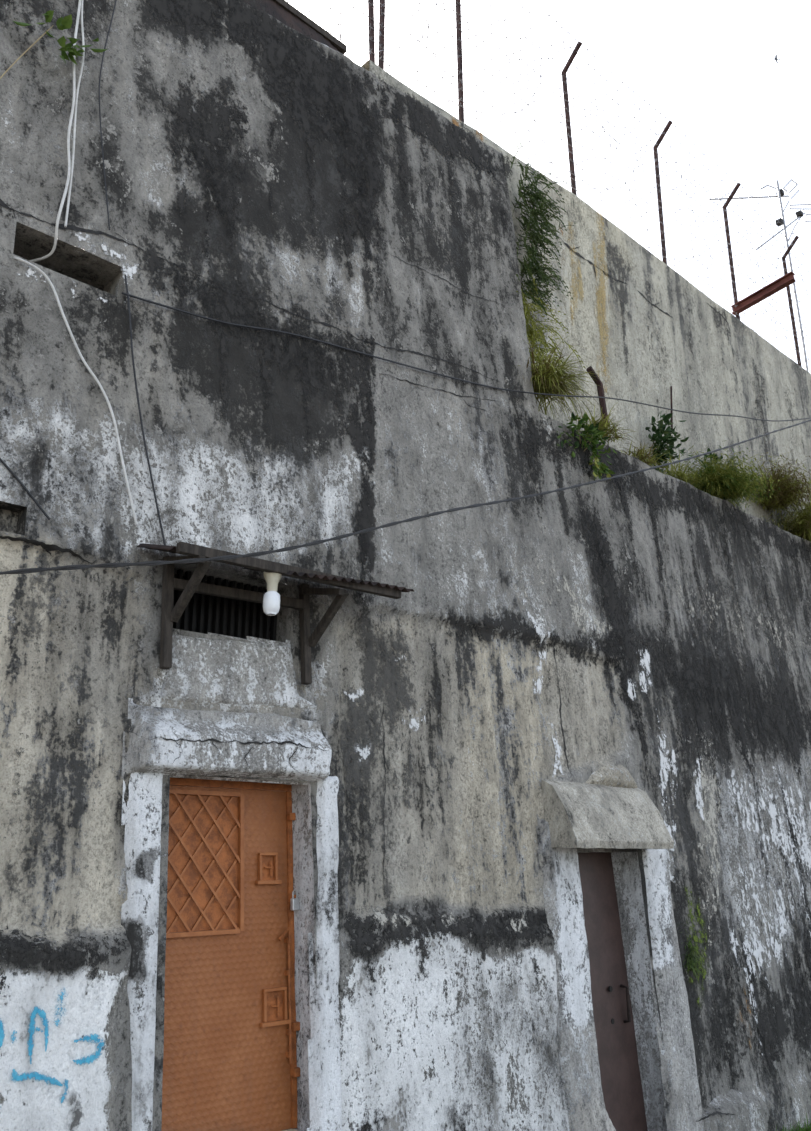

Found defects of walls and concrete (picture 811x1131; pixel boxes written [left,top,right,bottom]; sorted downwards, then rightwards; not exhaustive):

leakage [147,0,513,309]
crack [0,199,505,411]
leakage [713,307,734,363]
leakage [752,359,769,459]
leakage [21,557,51,652]
leakage [133,70,555,996]
crack [129,731,329,771]
leakage [431,411,811,1088]
leakage [0,773,128,997]